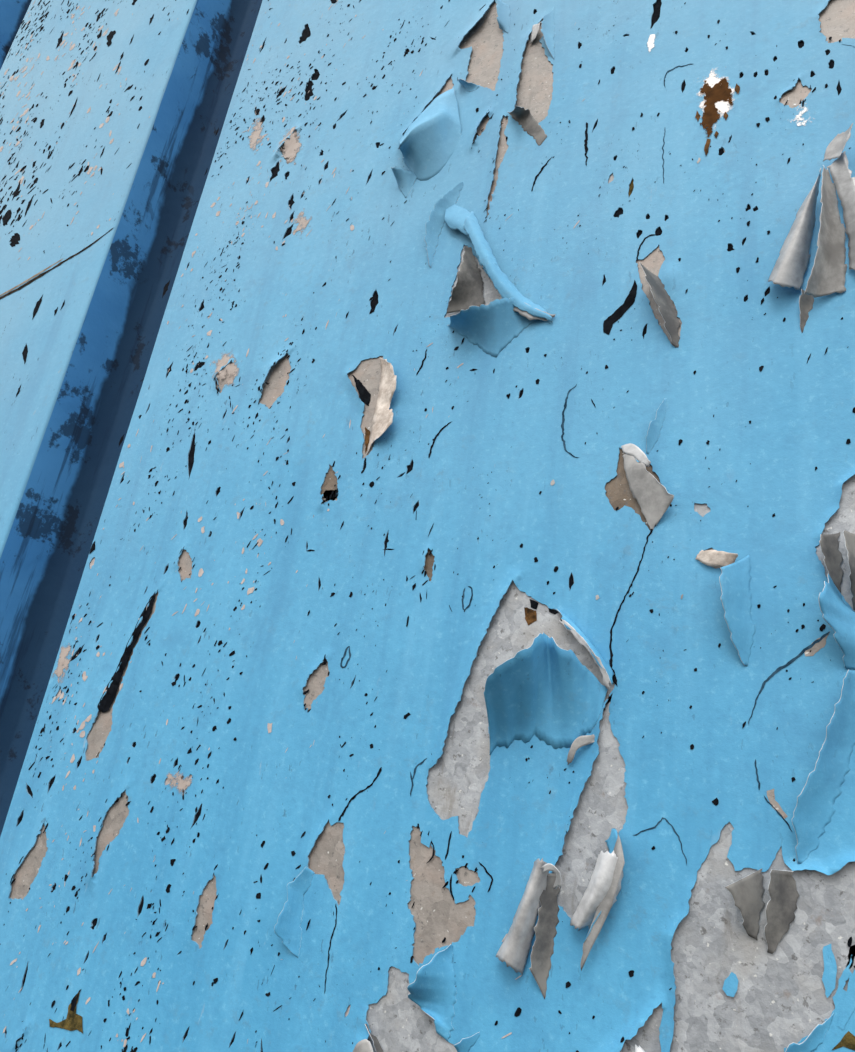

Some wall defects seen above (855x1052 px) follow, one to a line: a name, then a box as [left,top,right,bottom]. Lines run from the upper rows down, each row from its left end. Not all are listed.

peeling [391,0,511,198]
rust [695,69,740,156]
crack [0,228,113,299]
peeling [424,182,556,358]
peeling [603,214,682,349]
peeling [761,123,855,333]
peeling [348,356,397,470]
peeling [605,398,674,530]
crack [609,529,653,687]
peeling [353,581,628,1052]
peeling [620,475,855,1052]
rust [49,989,83,1033]